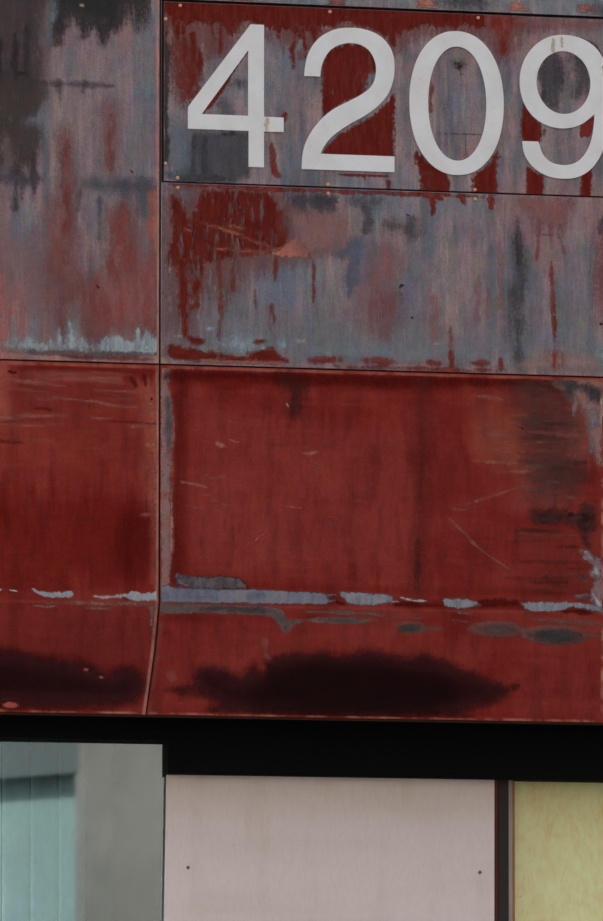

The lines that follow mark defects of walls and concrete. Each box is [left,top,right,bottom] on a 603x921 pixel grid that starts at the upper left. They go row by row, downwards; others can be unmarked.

rust [164,12,602,110]
damp [0,0,151,211]
rust [101,105,117,173]
rust [146,143,495,365]
damp [1,320,157,358]
rust [310,328,503,372]
peeling [31,588,73,598]
peeling [443,598,480,609]
rust [479,598,519,607]
rust [533,609,602,634]
damp [0,649,145,710]
damp [180,650,509,718]